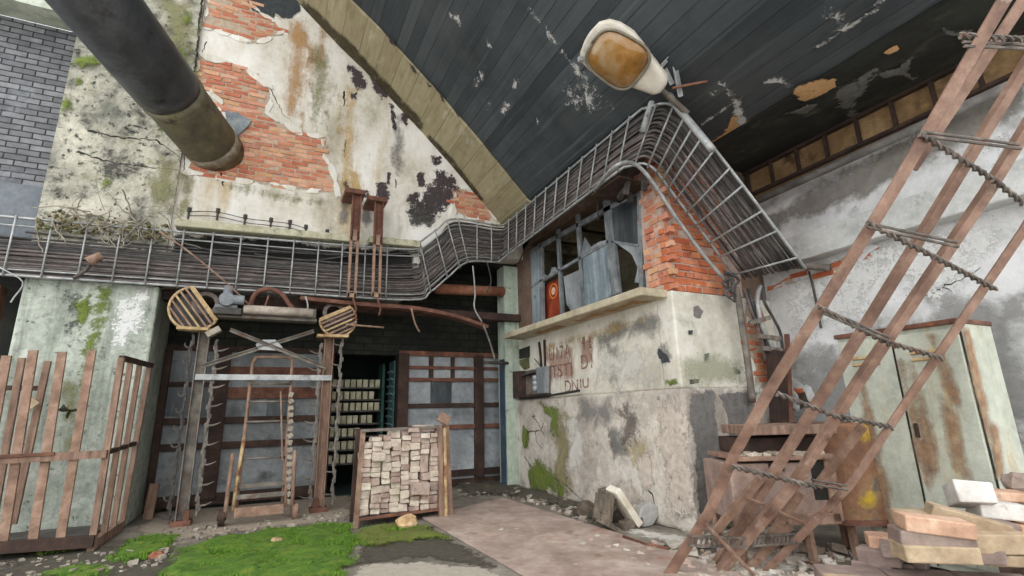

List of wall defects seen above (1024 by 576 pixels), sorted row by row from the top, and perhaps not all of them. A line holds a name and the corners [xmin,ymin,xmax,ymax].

crack [193,0,207,72]
spalling [202,0,288,44]
crack [76,130,185,171]
spalling [179,54,349,198]
water stain [301,3,483,201]
spalling [785,57,916,117]
water stain [409,202,435,228]
peeling [406,155,497,222]
peeling [767,242,903,339]
peeling [903,222,956,293]
peeling [926,219,1006,301]
water stain [565,400,646,470]